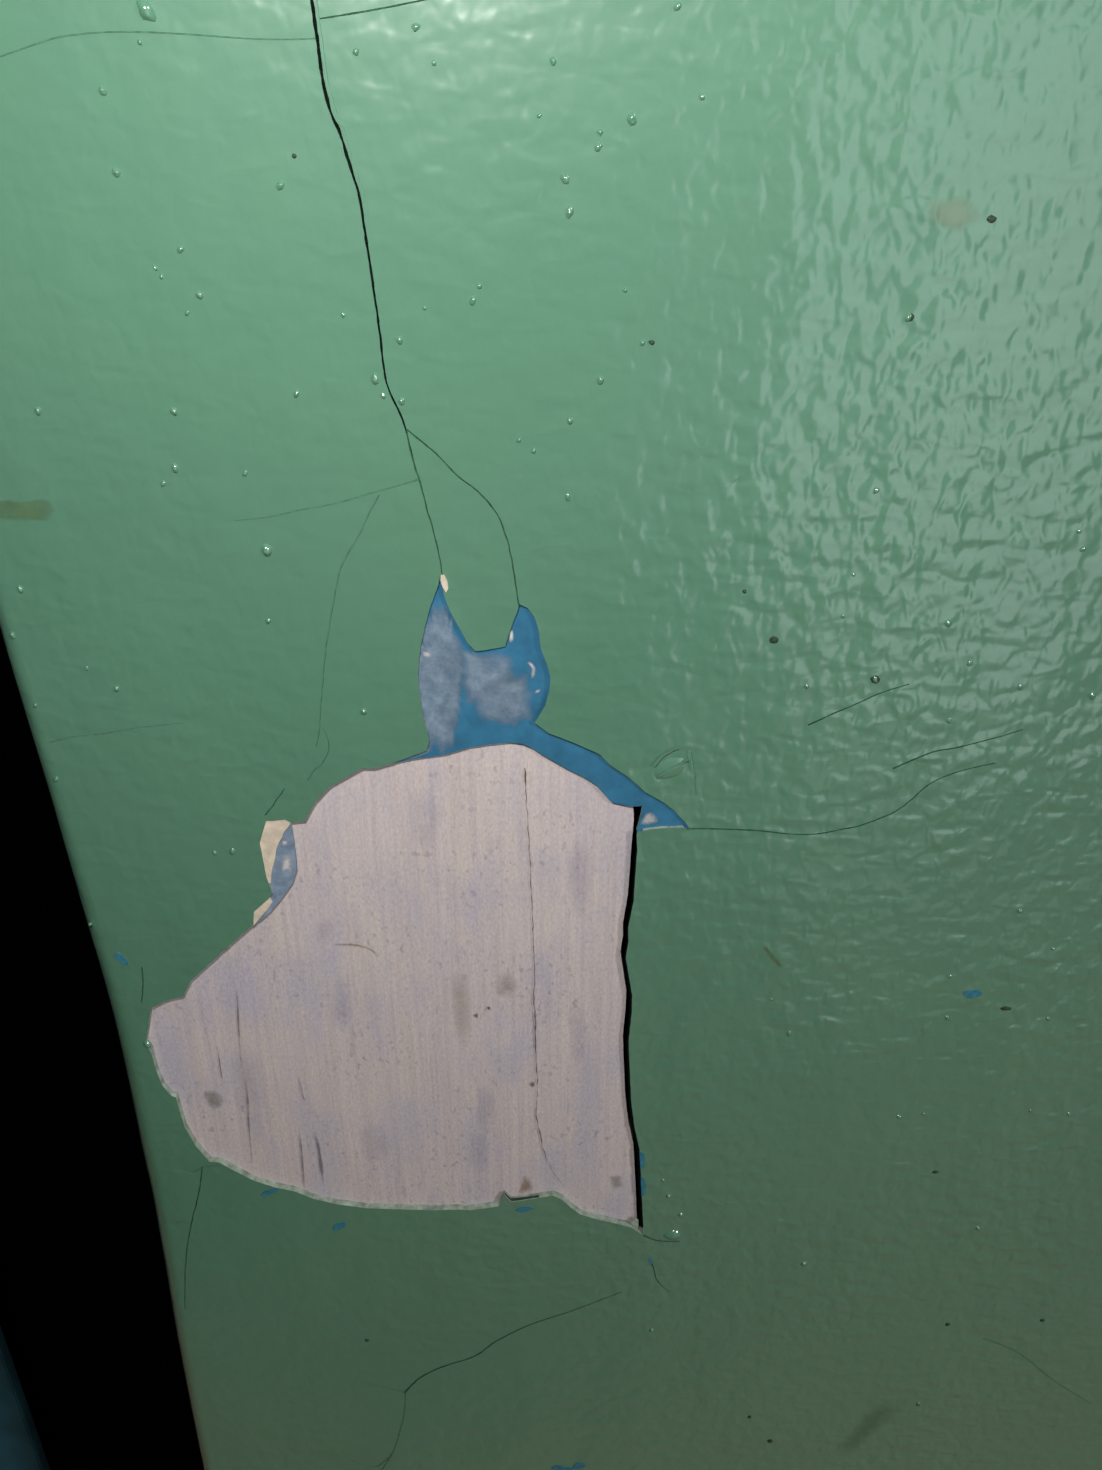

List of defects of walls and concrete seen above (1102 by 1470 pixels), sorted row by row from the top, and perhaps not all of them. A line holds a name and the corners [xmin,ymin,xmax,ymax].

crack [0,0,520,815]
crack [687,729,1023,835]
crack [808,684,909,726]
peeling [148,575,689,1230]
crack [643,1235,680,1292]
crack [353,1292,621,1470]